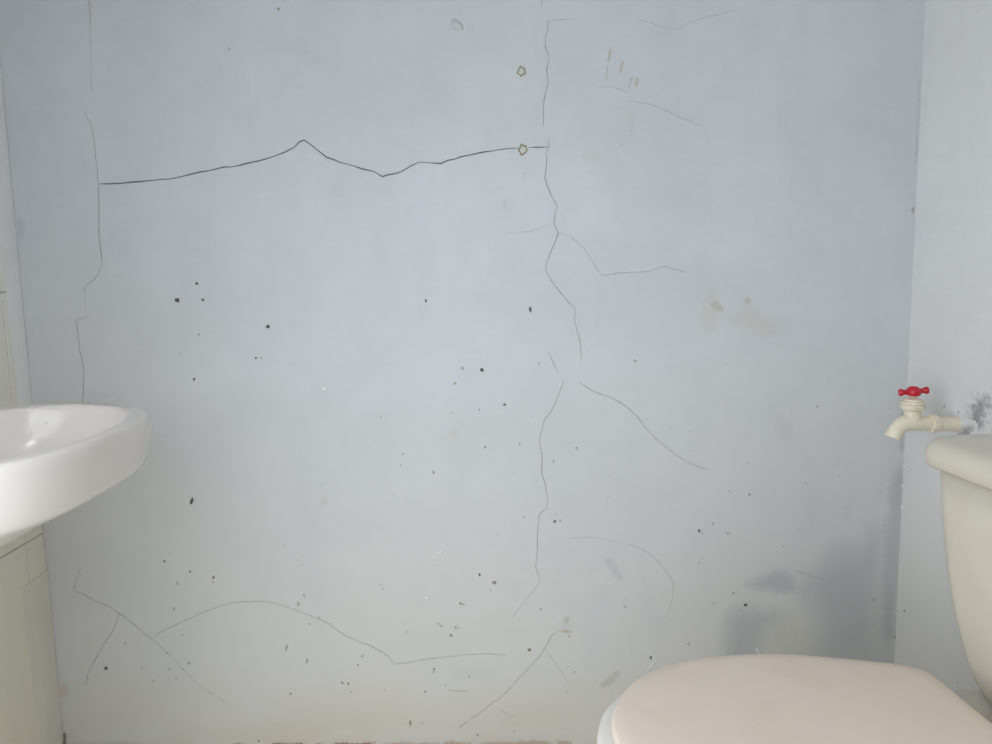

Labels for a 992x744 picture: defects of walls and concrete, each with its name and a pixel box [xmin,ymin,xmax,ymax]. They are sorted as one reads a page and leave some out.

crack [76,0,684,404]
crack [74,569,503,706]
crack [459,629,569,728]
crack [512,352,706,617]
leakage [707,433,905,664]